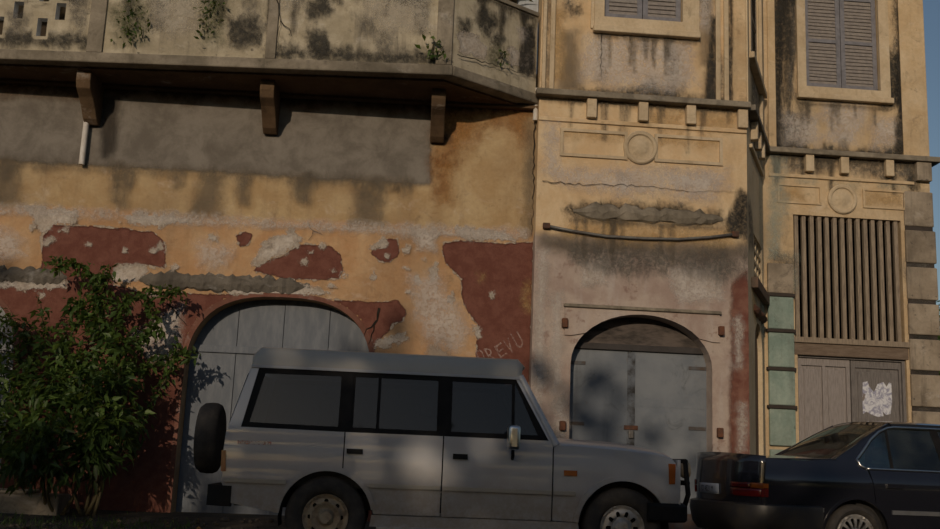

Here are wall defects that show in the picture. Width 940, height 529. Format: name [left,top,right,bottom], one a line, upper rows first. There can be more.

leakage [0,0,87,49]
leakage [204,0,269,47]
leakage [275,0,435,64]
leakage [562,34,578,90]
leakage [597,38,689,111]
leakage [701,0,733,100]
leakage [766,0,920,191]
peeling [0,205,533,513]